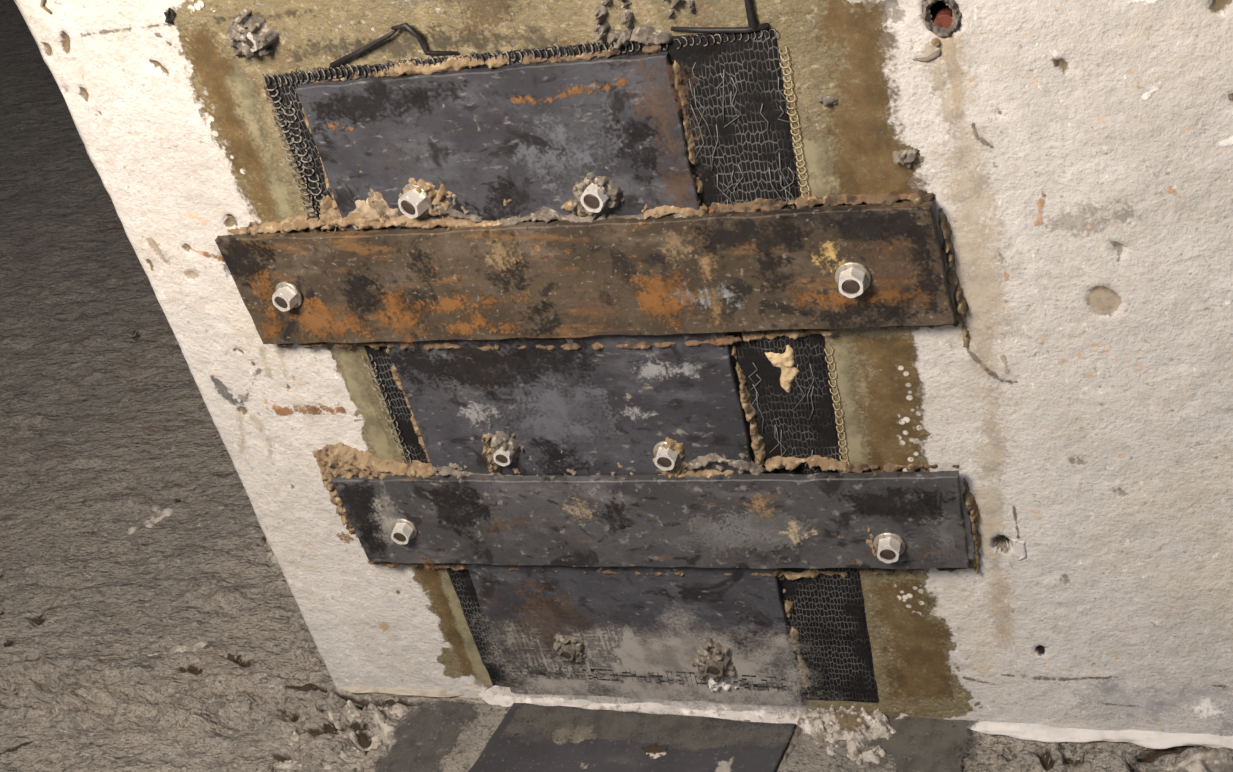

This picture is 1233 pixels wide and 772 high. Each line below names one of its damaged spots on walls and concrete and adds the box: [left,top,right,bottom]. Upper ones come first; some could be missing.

damp [166,0,958,476]
corrosion [250,270,532,346]
corrosion [631,270,697,326]
corrosion [794,283,934,310]
damp [329,479,388,555]
damp [430,485,493,540]
damp [599,498,633,533]
damp [839,487,958,519]
damp [412,563,493,690]
damp [803,569,982,772]